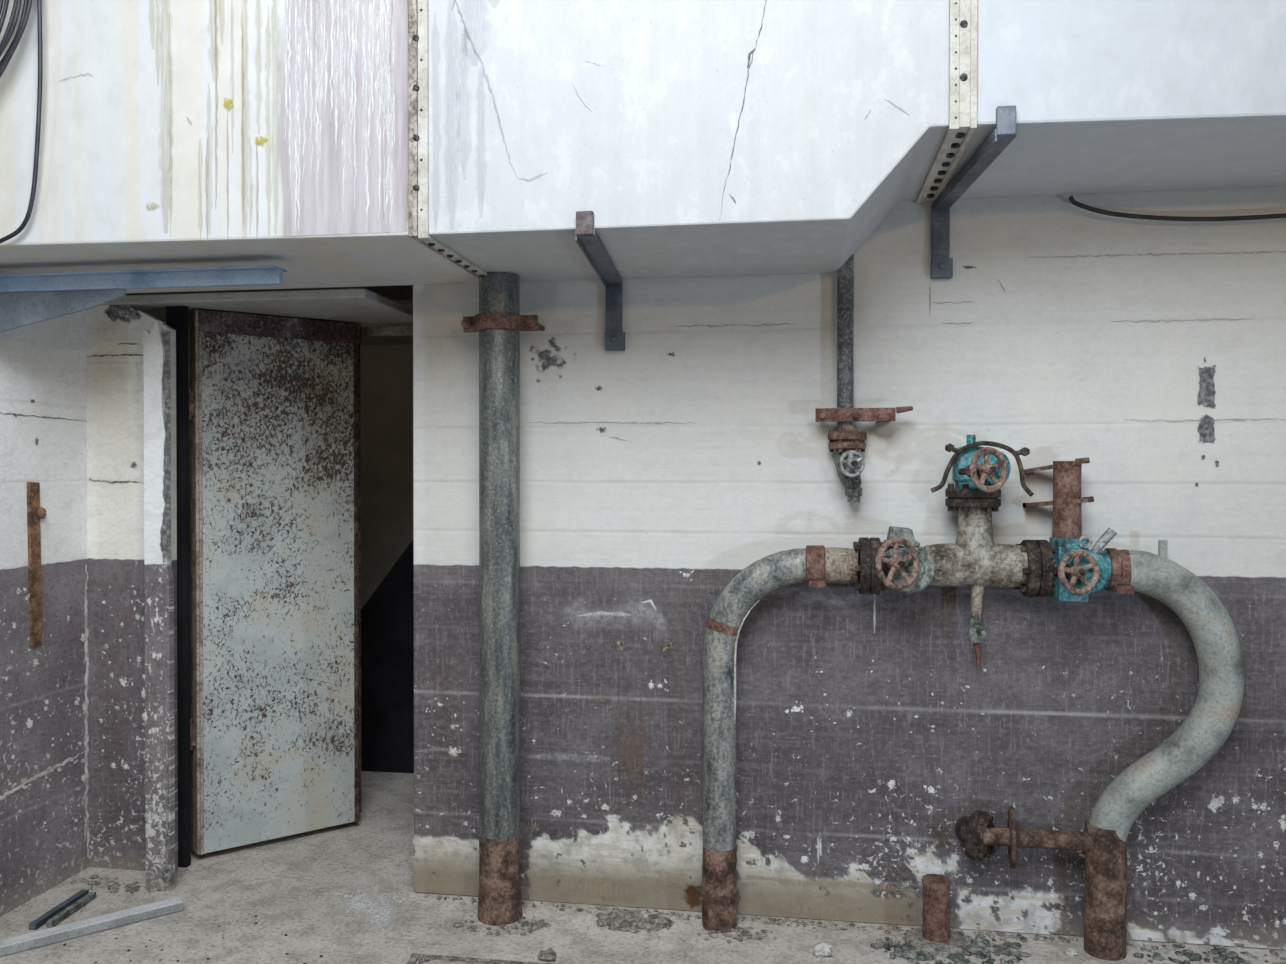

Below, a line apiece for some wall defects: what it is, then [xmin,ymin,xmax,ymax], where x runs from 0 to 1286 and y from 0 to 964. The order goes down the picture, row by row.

crack [719,7,765,220]
spalling [530,338,566,382]
peeling [525,803,703,911]
peeling [736,831,1062,934]